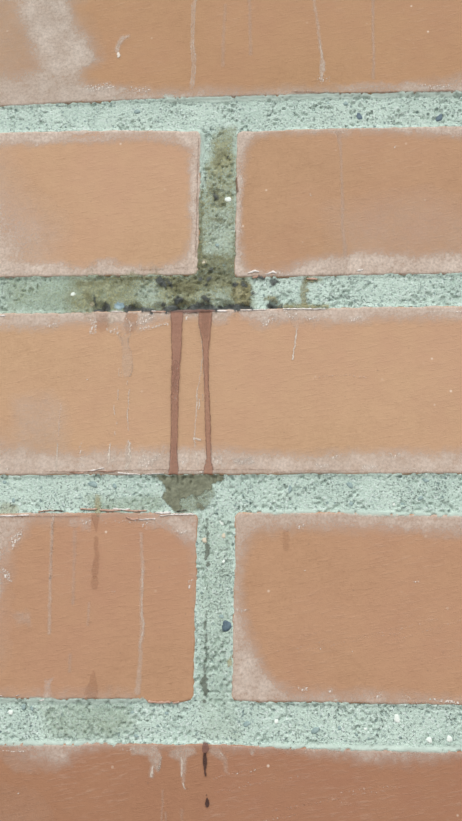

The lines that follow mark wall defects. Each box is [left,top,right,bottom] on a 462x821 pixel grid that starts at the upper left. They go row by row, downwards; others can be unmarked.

water stain [0,130,462,540]
water stain [236,513,462,560]
water stain [200,615,208,703]
water stain [232,600,309,702]